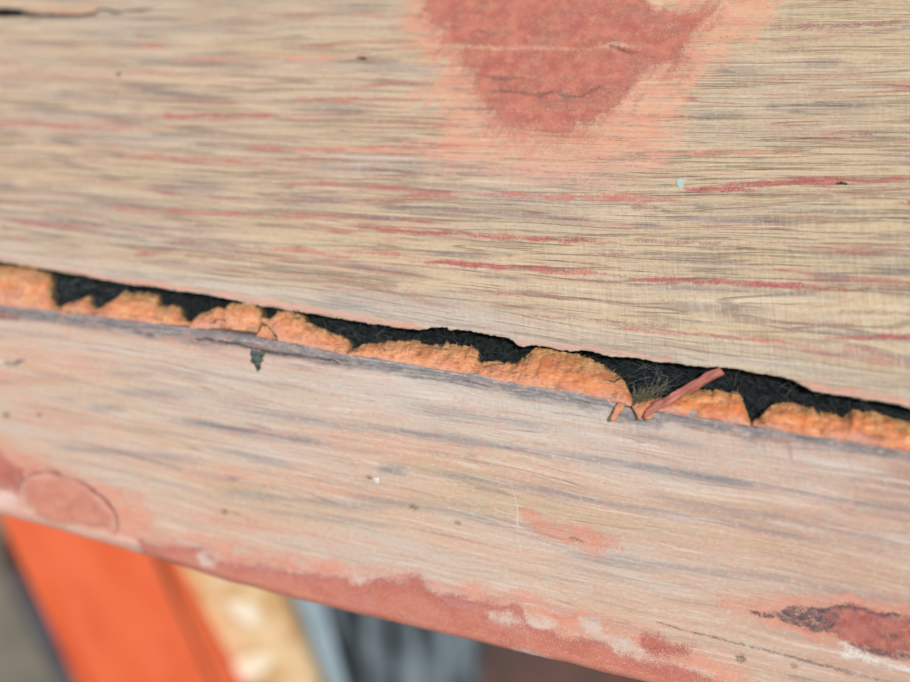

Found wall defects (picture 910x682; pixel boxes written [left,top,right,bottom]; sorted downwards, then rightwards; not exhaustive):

crack [0,7,151,18]
peeling [47,145,425,169]
peeling [358,219,747,258]
peeling [158,239,865,292]
peeling [449,288,595,301]
crack [0,311,20,319]
crack [195,337,341,364]
peeling [0,435,752,682]
peeling [708,587,910,673]